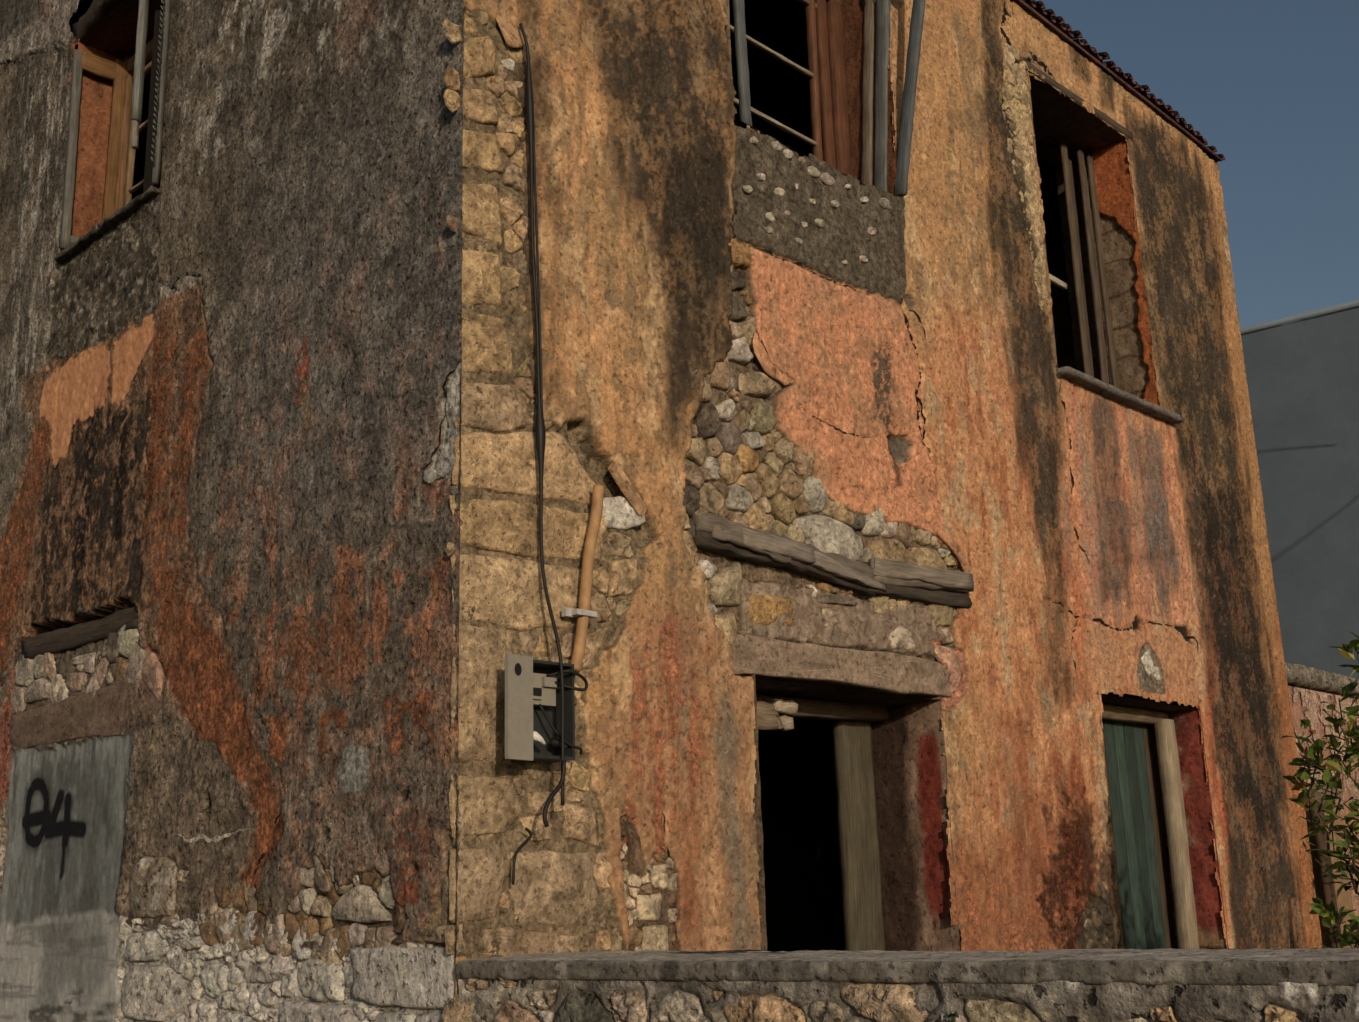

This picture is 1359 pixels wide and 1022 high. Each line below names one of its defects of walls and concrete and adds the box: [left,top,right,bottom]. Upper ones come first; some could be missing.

flaking render [11,625,167,719]
damp [31,386,158,630]
flaking render [39,314,155,466]
flaking render [199,7,679,967]
damp [583,0,734,426]
flaking render [683,238,972,710]
damp [982,0,1069,700]
crack [1046,598,1198,669]
damp [1072,47,1303,950]